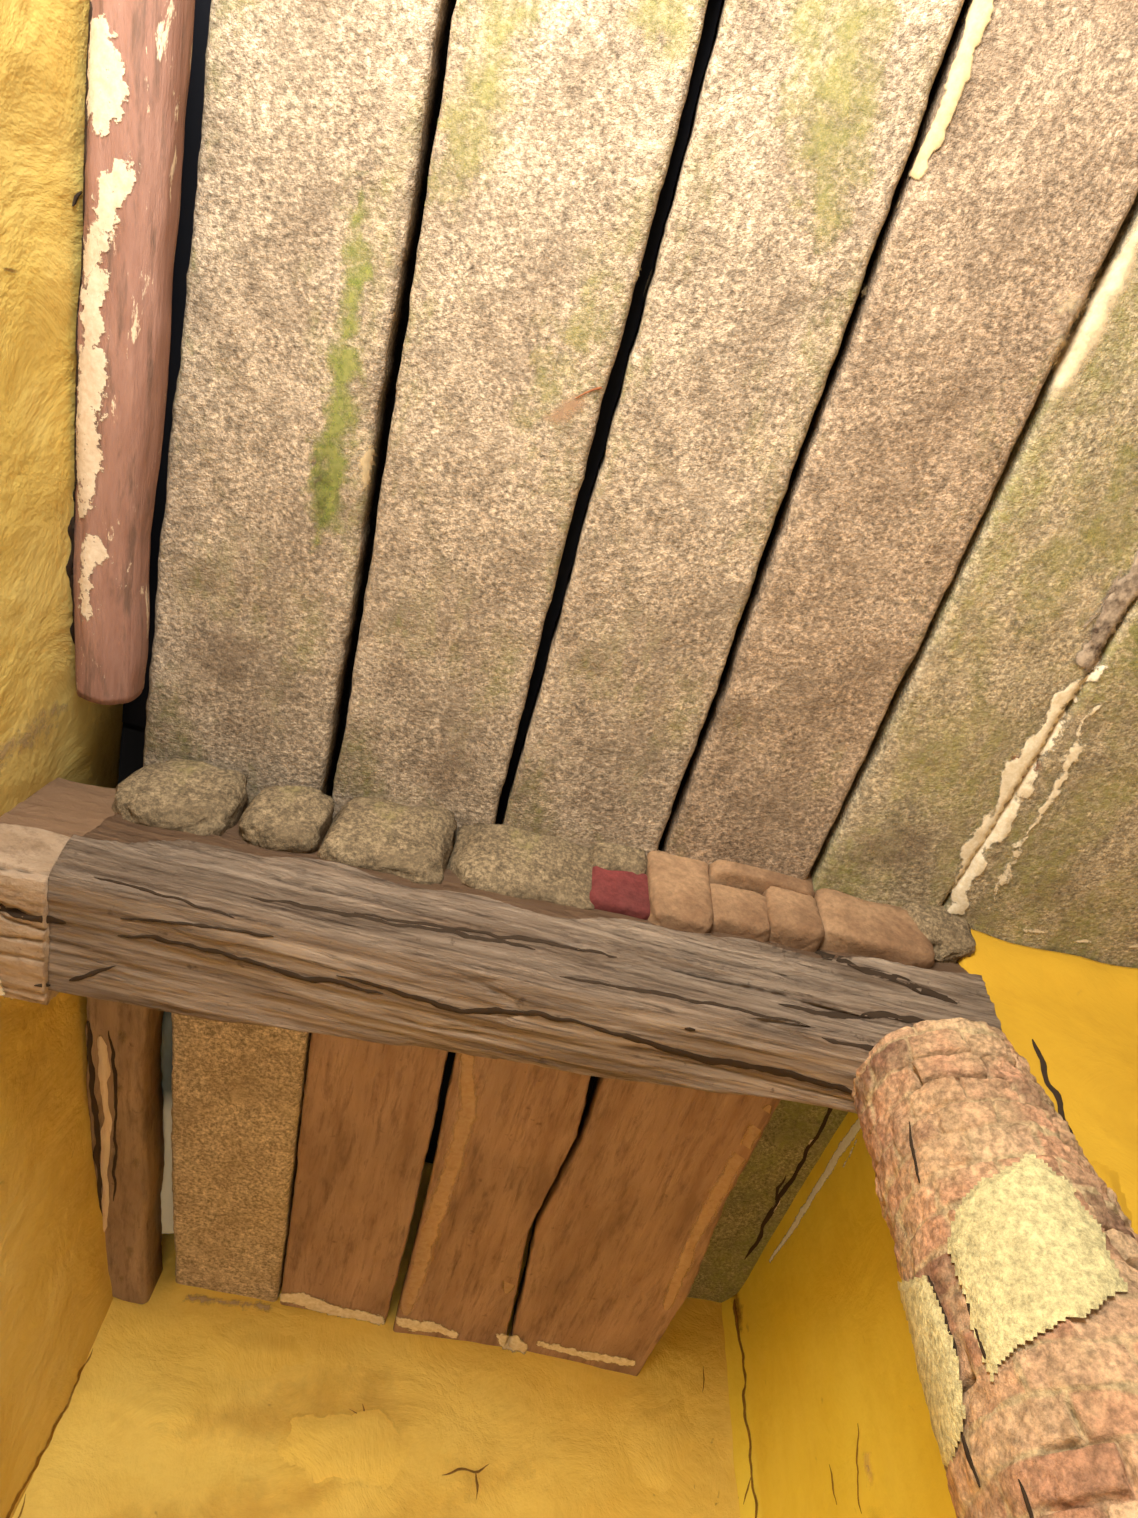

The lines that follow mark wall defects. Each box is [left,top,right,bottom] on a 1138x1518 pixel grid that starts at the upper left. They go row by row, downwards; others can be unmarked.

peeling [86,13,130,137]
peeling [76,158,140,621]
crack [0,903,67,924]
crack [34,877,958,1094]
crack [733,1299,758,1518]
crack [961,1432,981,1488]
crack [1018,1479,1034,1518]